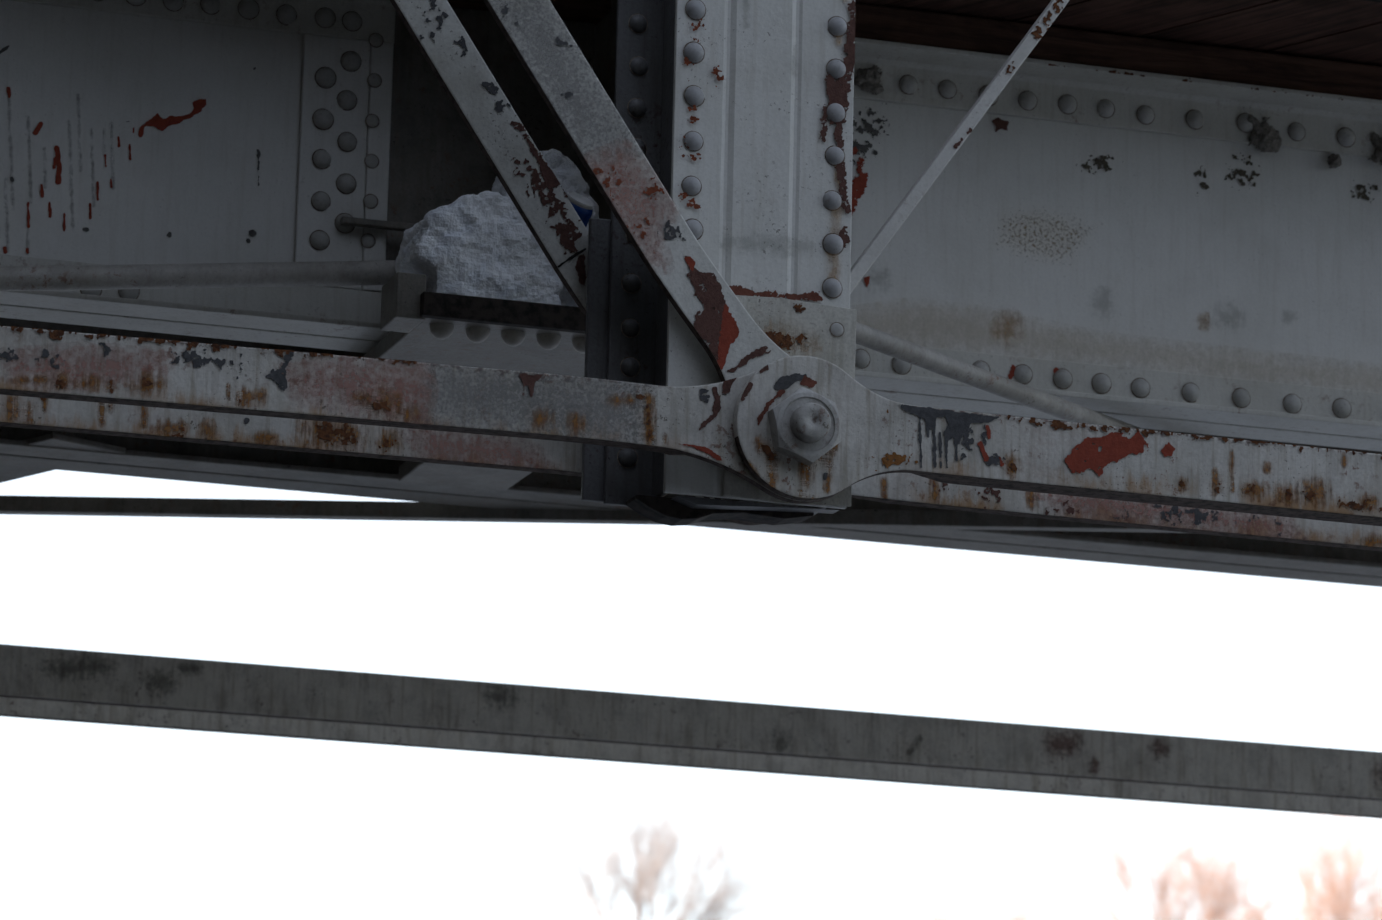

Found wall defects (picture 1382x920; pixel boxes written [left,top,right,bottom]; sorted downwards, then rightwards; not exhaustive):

peeling [27,145,66,231]
peeling [89,99,206,219]
peeling [479,79,586,285]
peeling [819,0,890,248]
corrosion [1,325,417,366]
peeling [626,217,817,461]
corrosion [6,375,113,426]
corrosion [141,374,213,438]
corrosion [301,394,418,454]
corrosion [613,394,666,443]
peeling [1065,430,1175,477]
corrosion [999,415,1382,512]